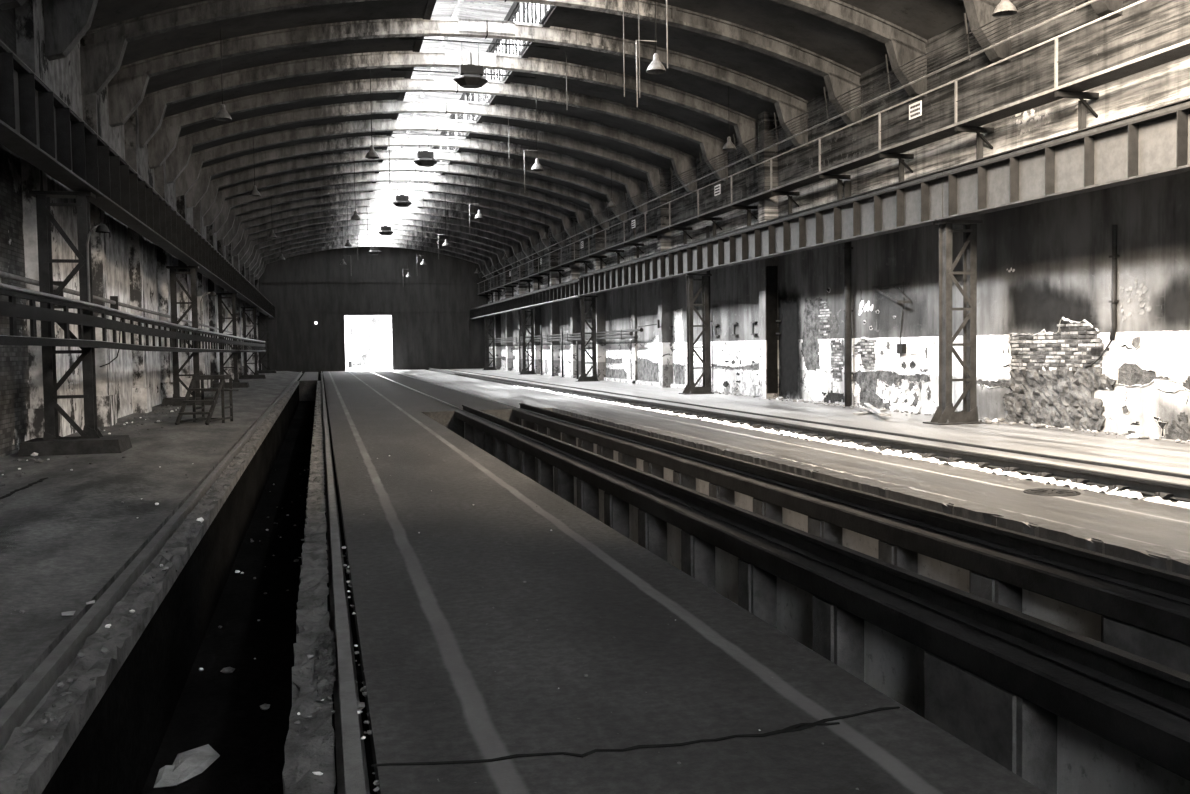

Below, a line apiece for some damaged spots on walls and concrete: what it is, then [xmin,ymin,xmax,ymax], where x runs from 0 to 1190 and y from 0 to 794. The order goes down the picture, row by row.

flaking render [801,288,932,414]
flaking render [976,317,1190,435]
flaking render [1153,412,1190,441]